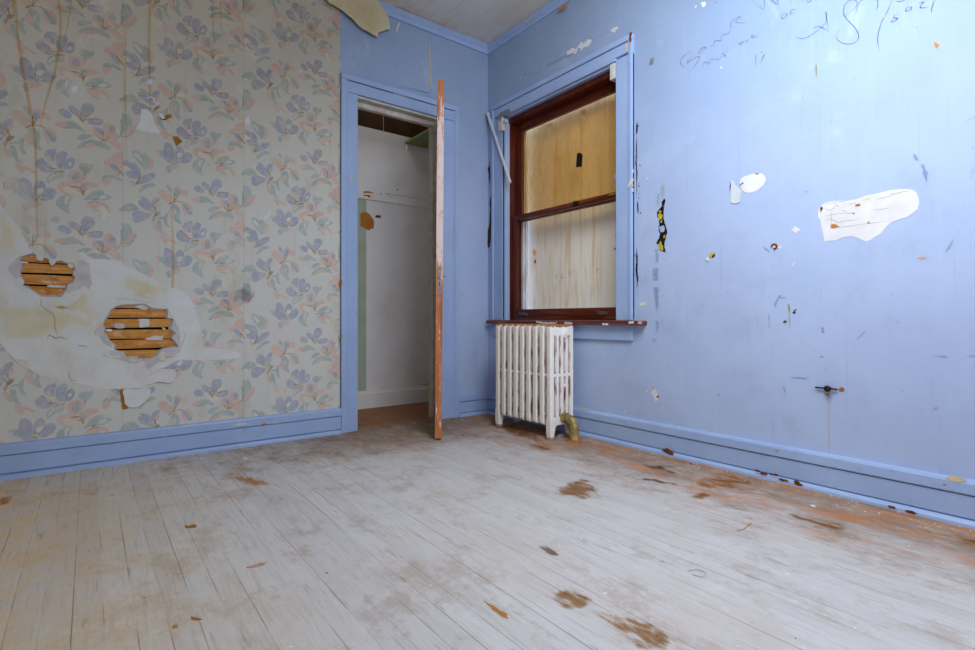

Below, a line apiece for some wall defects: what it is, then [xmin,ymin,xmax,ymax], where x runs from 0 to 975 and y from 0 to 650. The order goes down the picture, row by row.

peeling [730,173,766,204]
peeling [818,189,919,242]
flaking render [16,253,75,297]
flaking render [95,294,186,369]